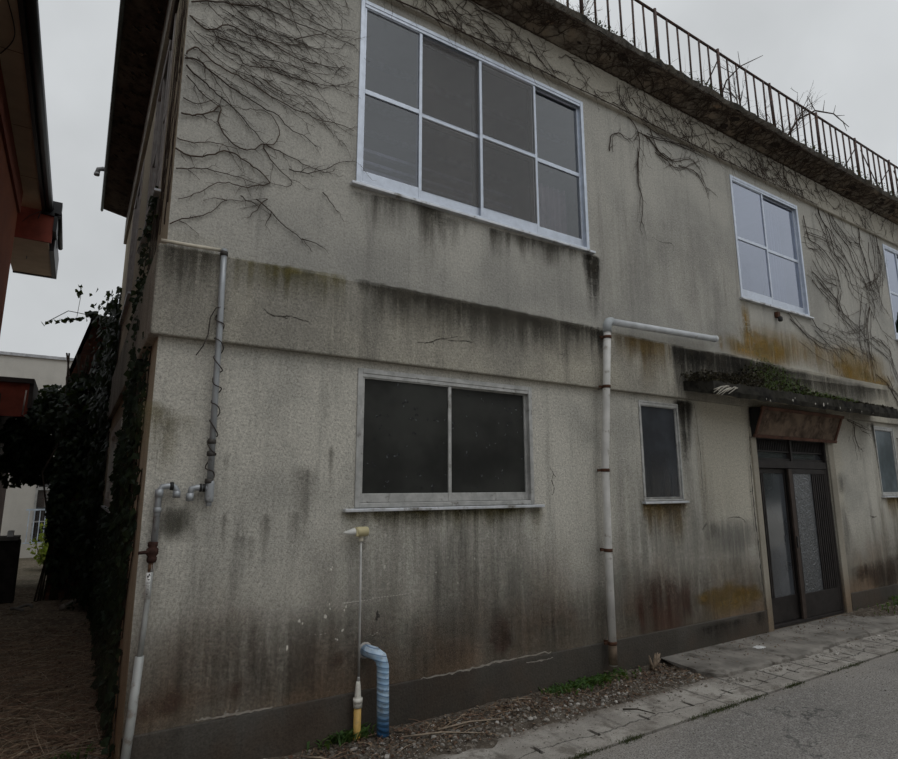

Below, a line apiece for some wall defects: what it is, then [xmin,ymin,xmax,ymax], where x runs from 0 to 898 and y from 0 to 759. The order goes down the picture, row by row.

damp [421,205,445,224]
damp [584,254,599,299]
damp [381,284,603,342]
crack [421,651,553,679]